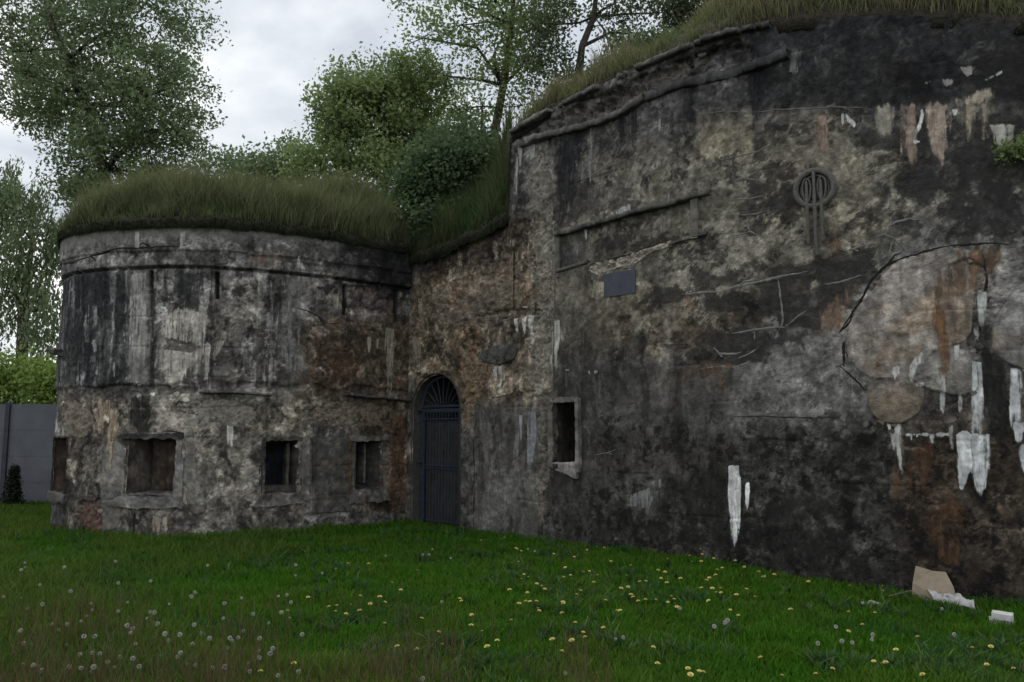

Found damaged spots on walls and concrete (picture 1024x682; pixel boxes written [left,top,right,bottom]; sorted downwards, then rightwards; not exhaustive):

leakage [62,270,225,386]
crack [681,218,1010,391]
leakage [887,290,1024,493]
corrosion [933,246,1001,374]
leakage [628,464,847,577]